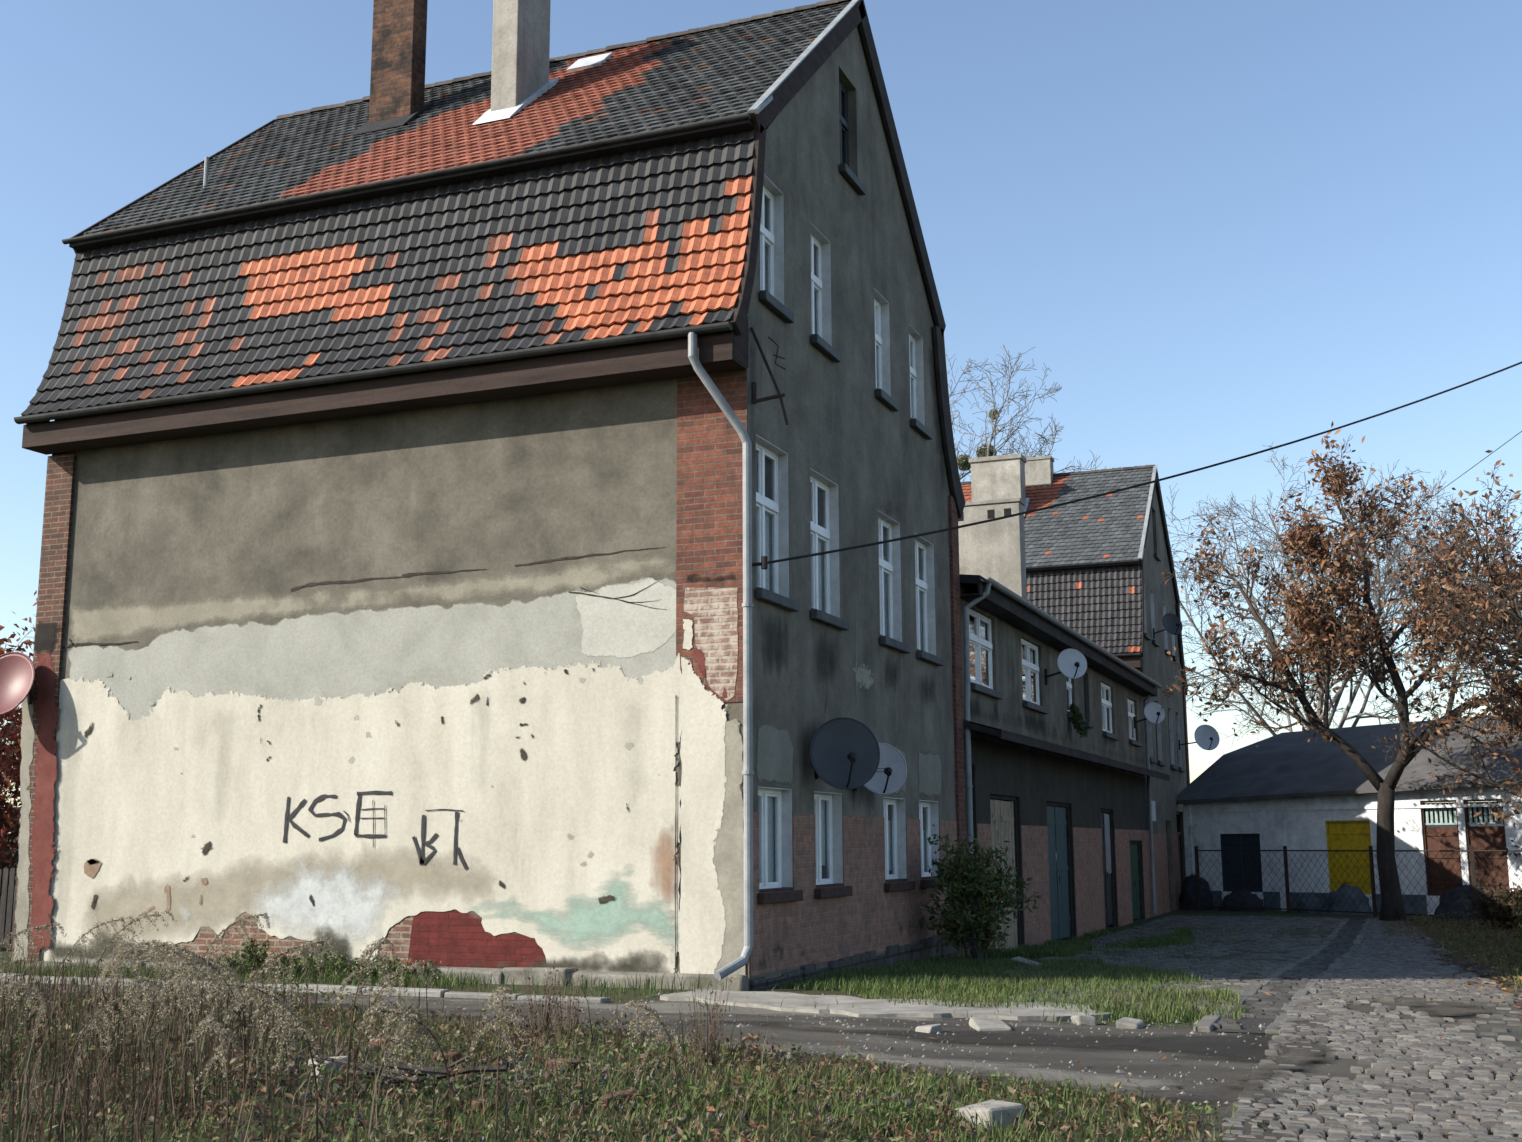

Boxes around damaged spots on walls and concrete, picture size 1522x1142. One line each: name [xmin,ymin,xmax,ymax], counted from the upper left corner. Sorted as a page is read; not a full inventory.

peeling [12,555,793,975]
crack [291,547,667,610]